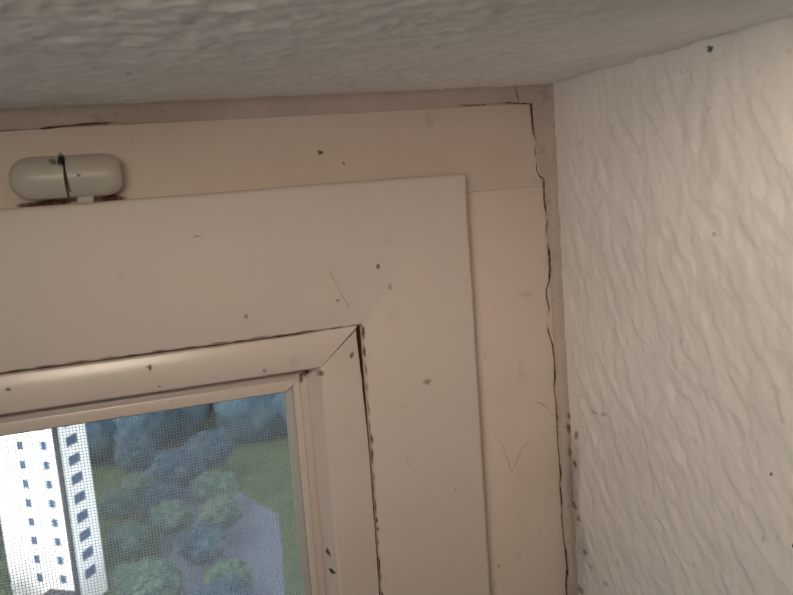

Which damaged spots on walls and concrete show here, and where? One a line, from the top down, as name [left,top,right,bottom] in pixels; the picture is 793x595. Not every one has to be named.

crack [506,91,551,308]
crack [548,329,568,595]